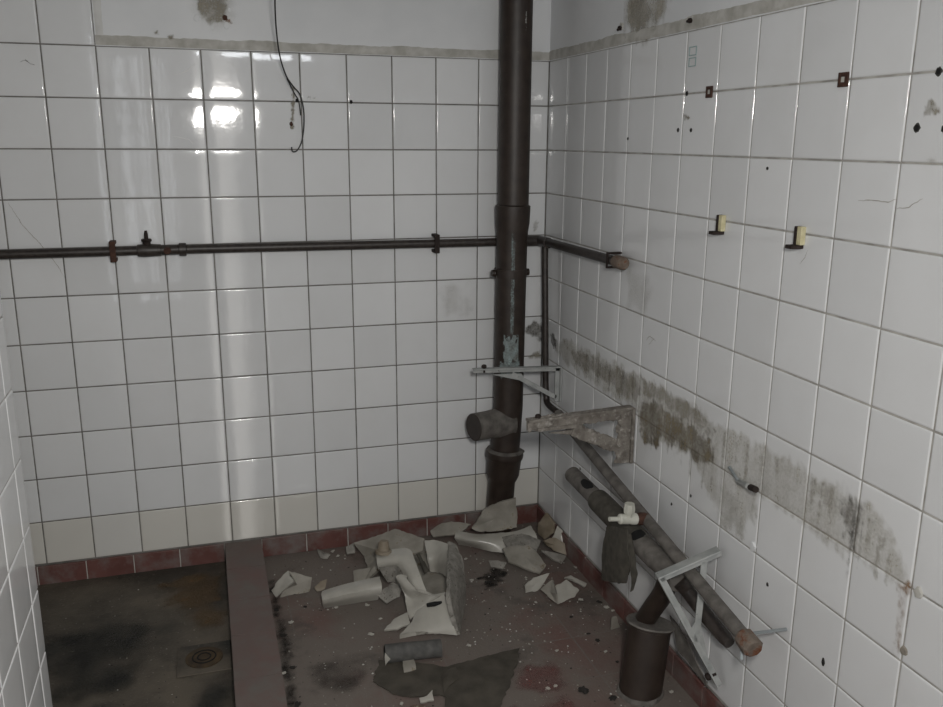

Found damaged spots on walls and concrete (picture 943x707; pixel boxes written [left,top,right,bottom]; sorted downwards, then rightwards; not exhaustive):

peeling [193,0,232,30]
damp [640,384,713,462]